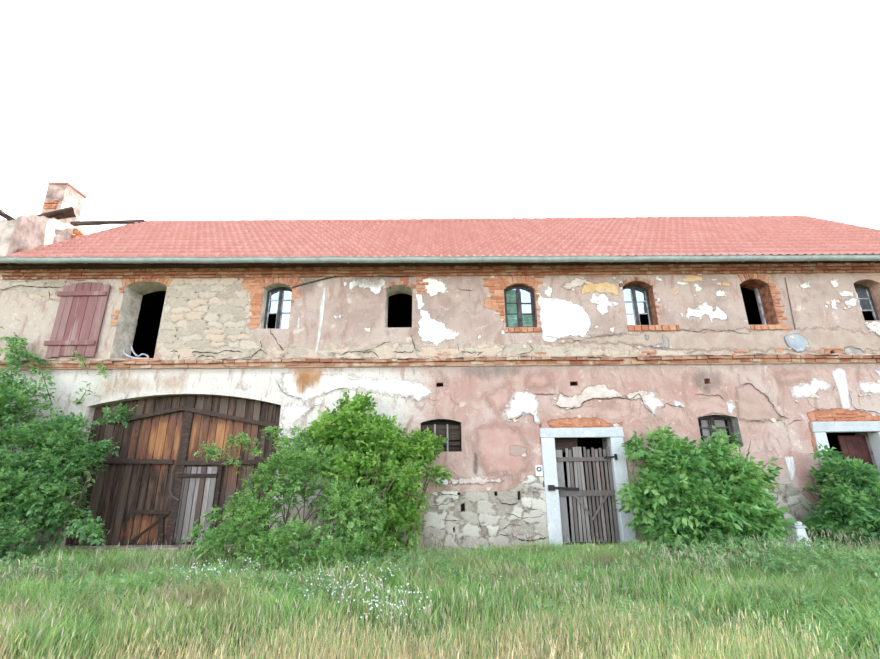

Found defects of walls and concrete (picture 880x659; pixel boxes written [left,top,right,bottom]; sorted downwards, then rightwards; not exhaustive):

spalling [156,274,880,361]
crack [171,330,284,359]
crack [342,335,416,358]
crack [277,378,360,412]
peeling [501,384,685,444]
crack [510,392,724,425]
crack [741,383,879,427]
peeling [790,376,831,403]
peeling [857,370,880,396]
spalling [806,408,880,459]
spalling [422,470,549,548]